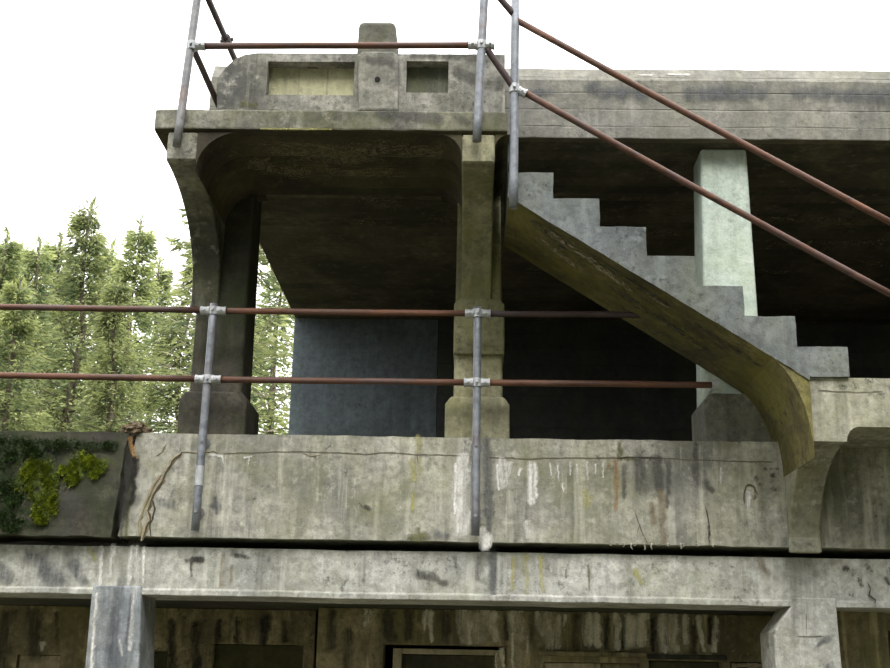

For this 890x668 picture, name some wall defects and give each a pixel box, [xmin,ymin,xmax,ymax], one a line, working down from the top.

damp [0,432,139,538]
crack [138,444,771,541]
damp [446,454,471,538]
damp [479,446,538,595]
damp [0,608,46,668]
damp [90,547,115,668]
damp [108,545,146,665]
damp [168,618,201,668]
damp [382,609,529,668]
damp [536,611,719,654]